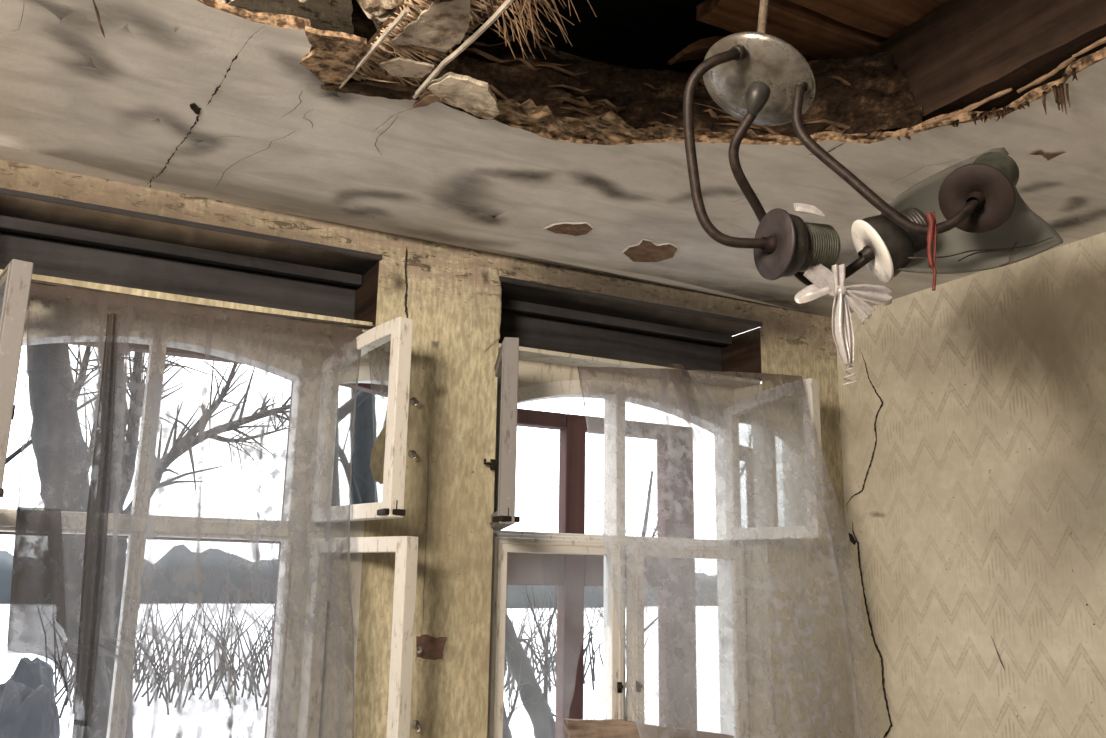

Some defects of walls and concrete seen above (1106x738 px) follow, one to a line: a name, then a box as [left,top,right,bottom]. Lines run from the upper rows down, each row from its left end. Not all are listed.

crack [145,28,261,188]
crack [218,92,313,184]
flaking render [197,0,1106,146]
peeling [1031,150,1065,161]
peeling [542,222,595,237]
peeling [621,238,680,263]
crack [847,354,893,738]
peeling [413,632,450,663]